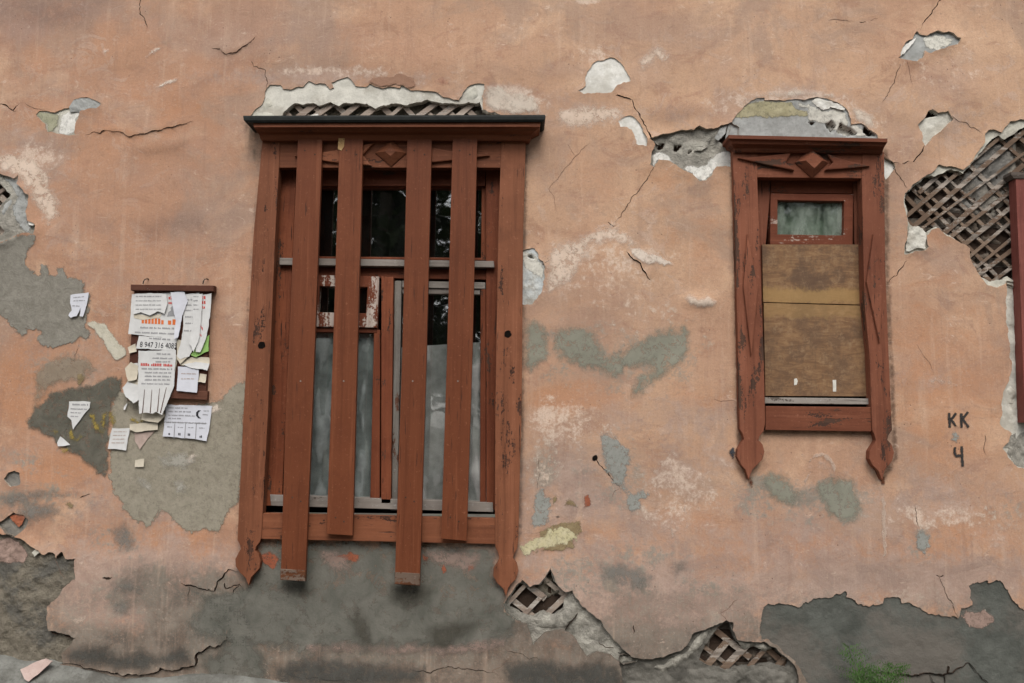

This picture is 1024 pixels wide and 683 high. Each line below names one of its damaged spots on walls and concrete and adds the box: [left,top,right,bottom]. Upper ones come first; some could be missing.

flaking render [899,32,959,61]
flaking render [37,98,101,135]
crack [87,121,193,137]
flaking render [251,74,539,116]
flaking render [559,58,877,181]
flaking render [918,111,952,145]
flaking render [0,155,58,235]
crack [542,94,660,265]
flaking render [904,120,1024,254]
peeling [523,226,671,305]
flaking render [0,513,75,662]
flaking render [504,568,1024,683]